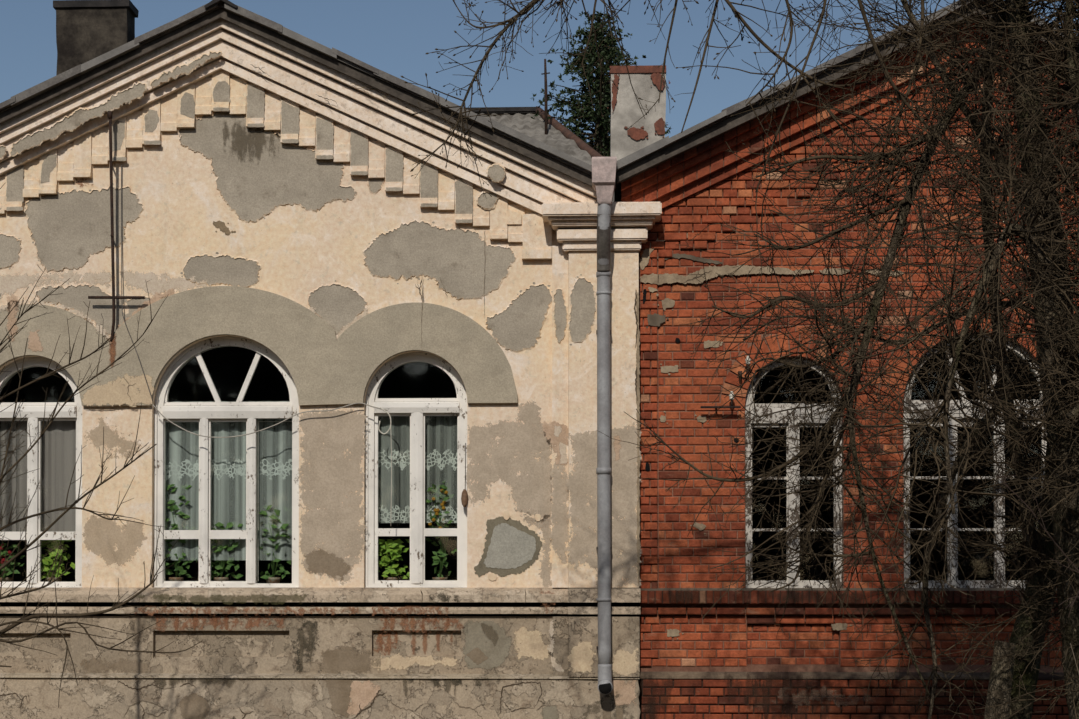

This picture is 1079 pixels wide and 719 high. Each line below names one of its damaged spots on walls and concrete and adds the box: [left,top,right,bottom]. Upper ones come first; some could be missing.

flaking render [0,51,262,351]
flaking render [177,81,404,235]
flaking render [420,163,438,207]
flaking render [362,179,516,300]
peeling [624,117,668,140]
flaking render [308,280,368,339]
flaking render [485,274,597,353]
peeling [297,406,368,585]
peeling [464,402,598,588]
peeling [610,287,675,588]
crack [119,680,196,695]
crack [352,681,554,719]